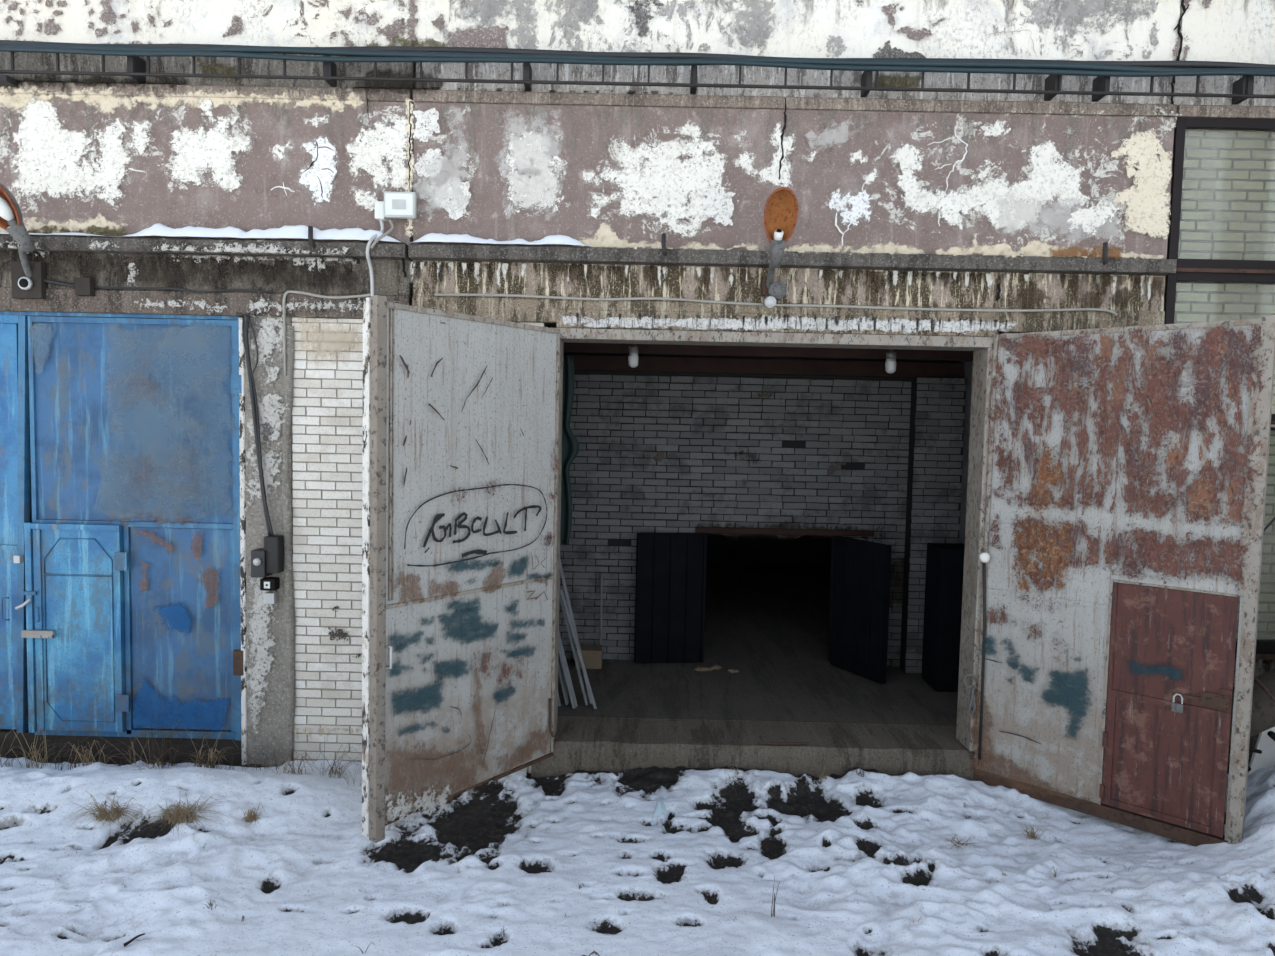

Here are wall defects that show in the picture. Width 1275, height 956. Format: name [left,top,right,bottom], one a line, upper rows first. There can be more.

crack [986,30,1080,60]
crack [1171,0,1190,104]
peeling [0,86,257,214]
peeling [269,98,477,237]
peeling [581,119,816,239]
peeling [826,103,1182,253]
damp [743,314,896,325]
damp [784,234,1102,258]
damp [818,270,1163,308]
damp [1120,251,1164,259]
corrosion [191,533,219,608]
corrosion [1008,445,1077,596]